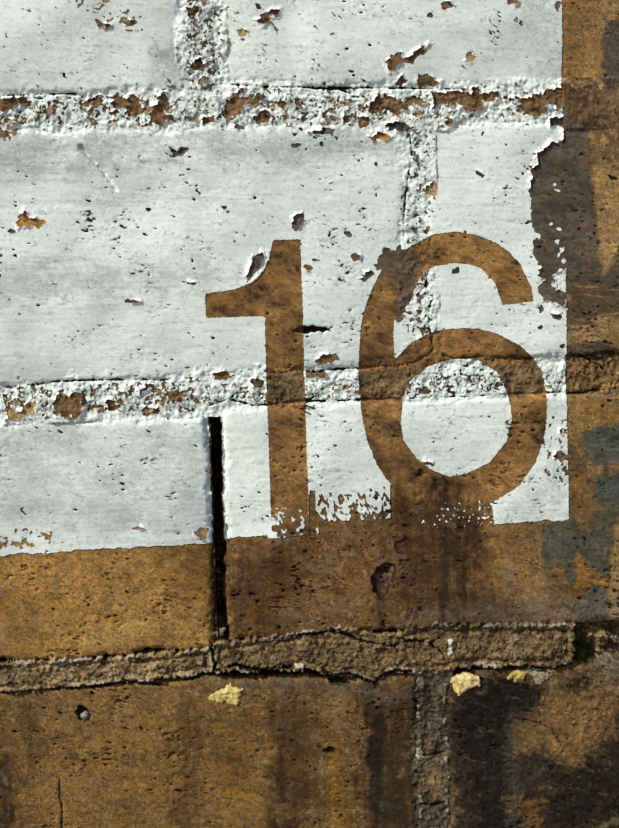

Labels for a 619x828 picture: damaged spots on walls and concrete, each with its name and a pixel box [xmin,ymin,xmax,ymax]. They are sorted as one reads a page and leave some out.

peeling [75,0,143,32]
peeling [0,86,177,145]
peeling [185,0,579,244]
spalling [168,146,189,158]
peeling [533,244,580,320]
peeling [209,364,231,381]
peeling [305,348,340,382]
crack [546,352,618,394]
peeling [0,376,198,425]
peeling [0,528,52,549]
crack [1,629,443,694]
water stain [353,676,427,828]